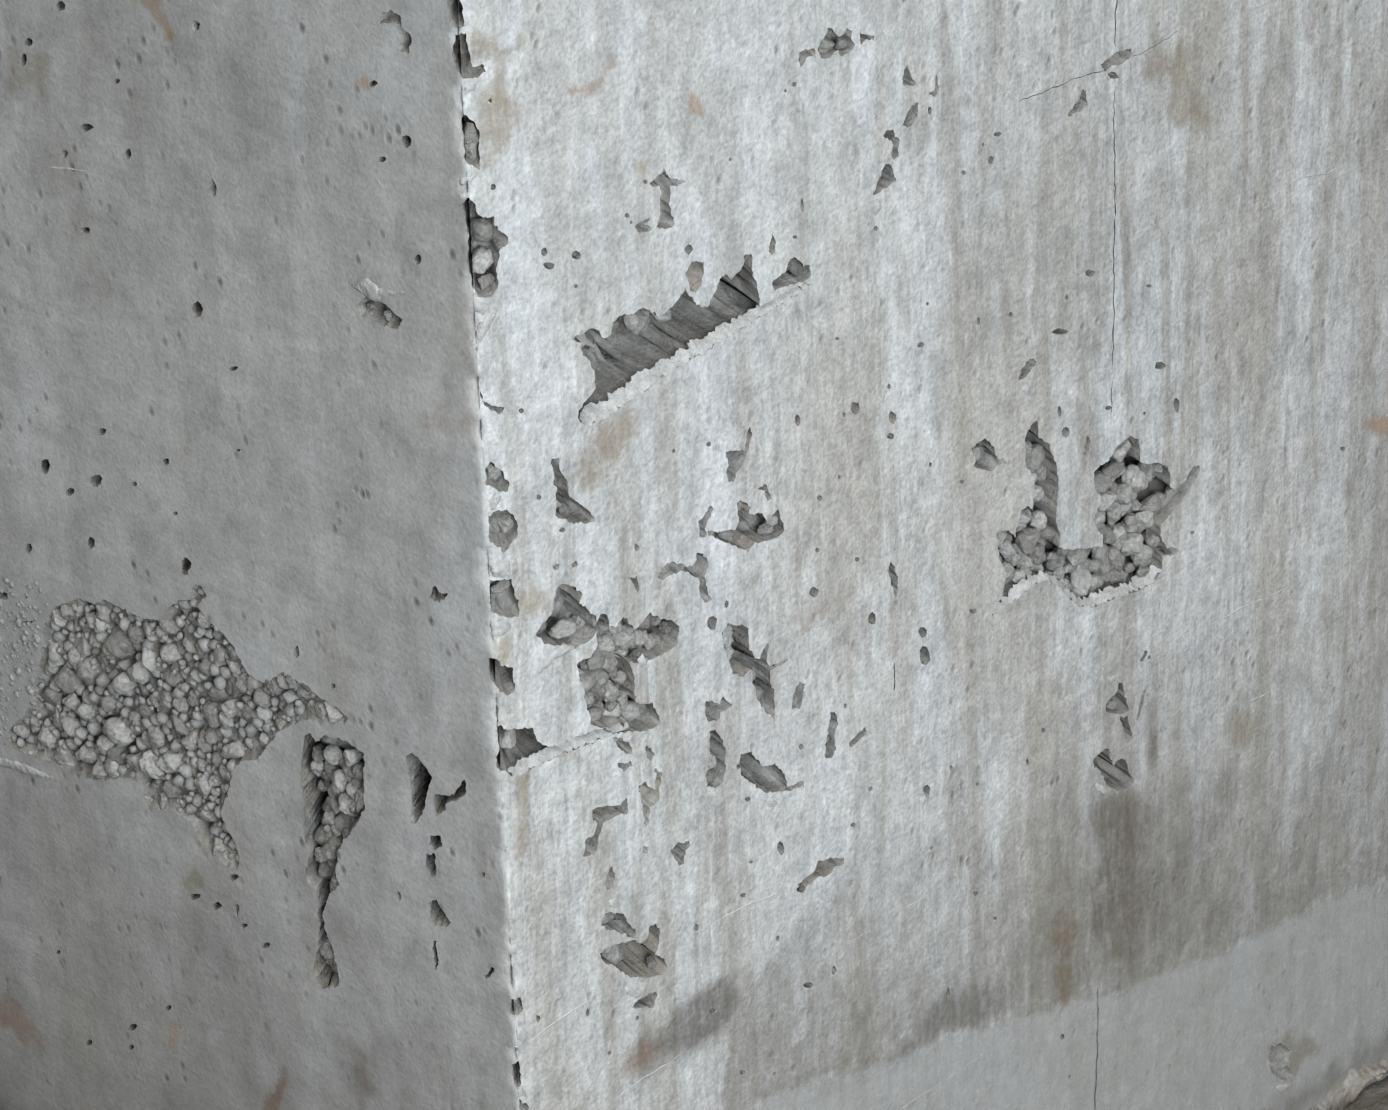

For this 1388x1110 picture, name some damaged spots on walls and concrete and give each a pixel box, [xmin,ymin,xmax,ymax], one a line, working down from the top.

peeling [458,114,509,350]
spalling [573,234,812,427]
peeling [537,644,575,674]
peeling [0,758,53,779]